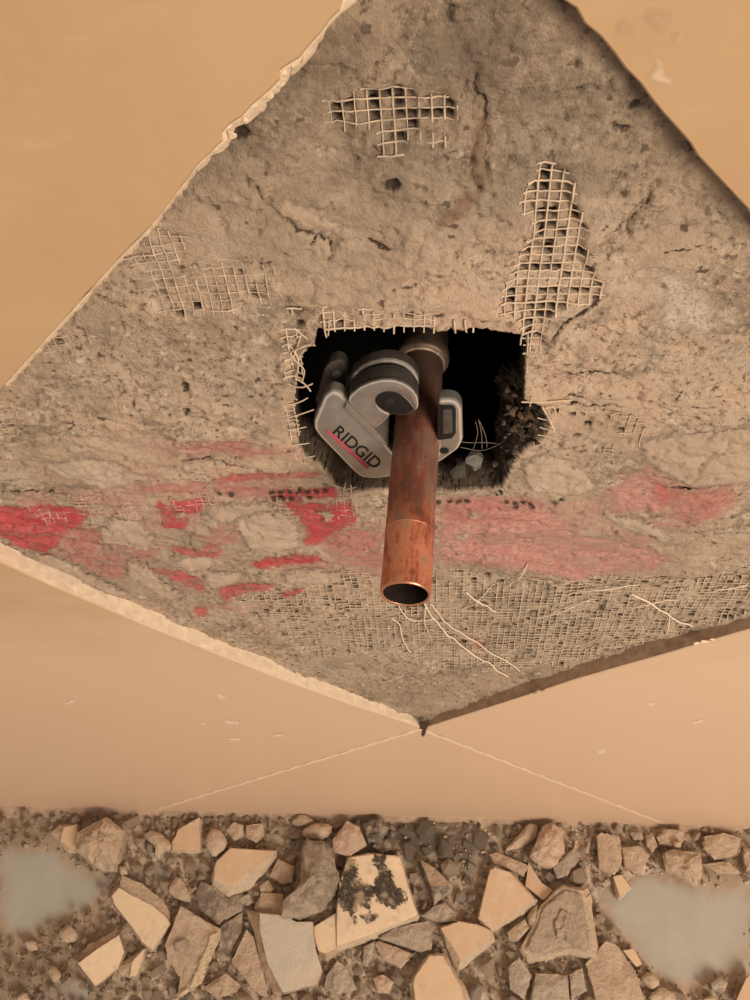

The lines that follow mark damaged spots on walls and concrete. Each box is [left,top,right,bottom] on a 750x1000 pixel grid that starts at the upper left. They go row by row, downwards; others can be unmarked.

spalling [5,0,357,386]
crack [605,194,651,237]
crack [553,296,602,338]
spalling [483,386,540,478]